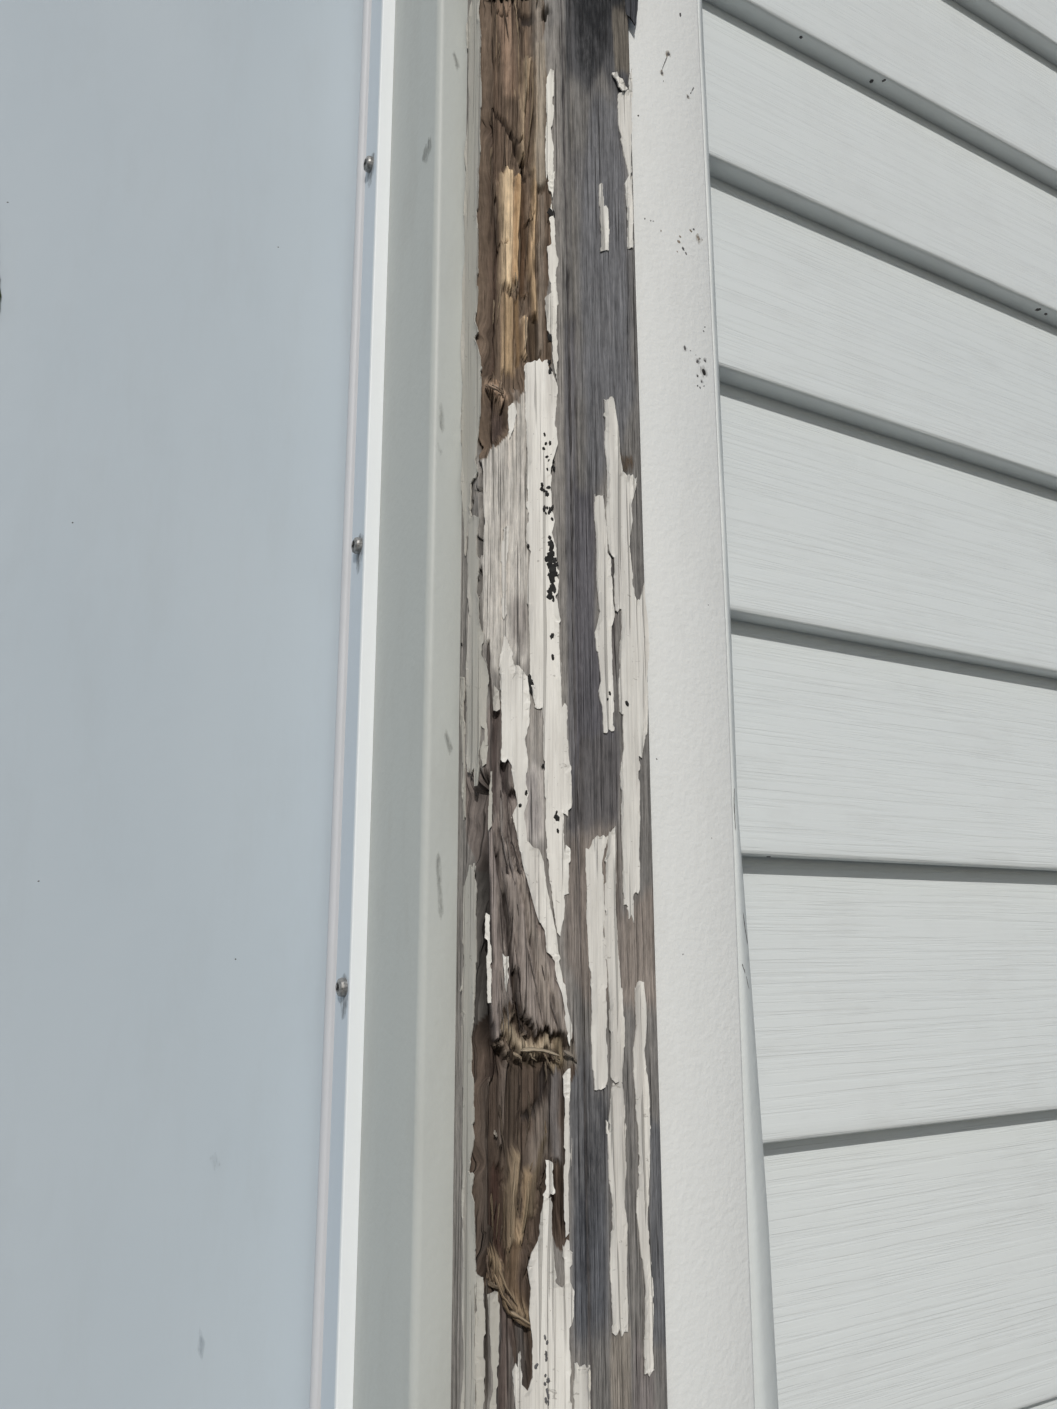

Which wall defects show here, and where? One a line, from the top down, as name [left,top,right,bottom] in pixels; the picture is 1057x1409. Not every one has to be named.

peeling [460,0,654,1409]